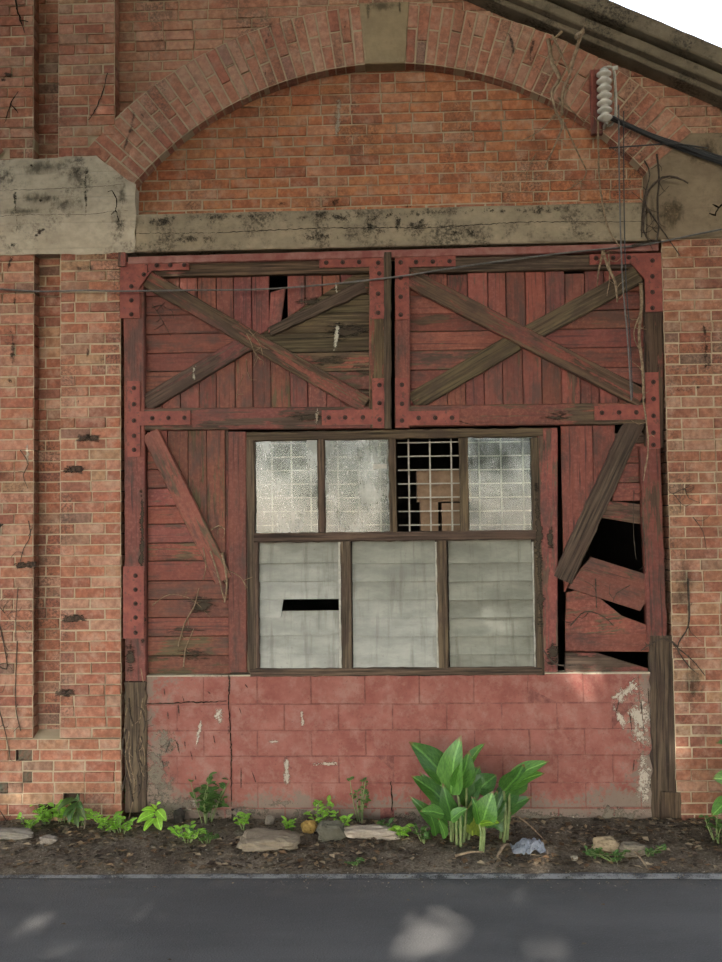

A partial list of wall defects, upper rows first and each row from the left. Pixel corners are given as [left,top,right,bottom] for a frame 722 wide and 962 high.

damp [302,199,473,240]
peeling [597,679,652,820]